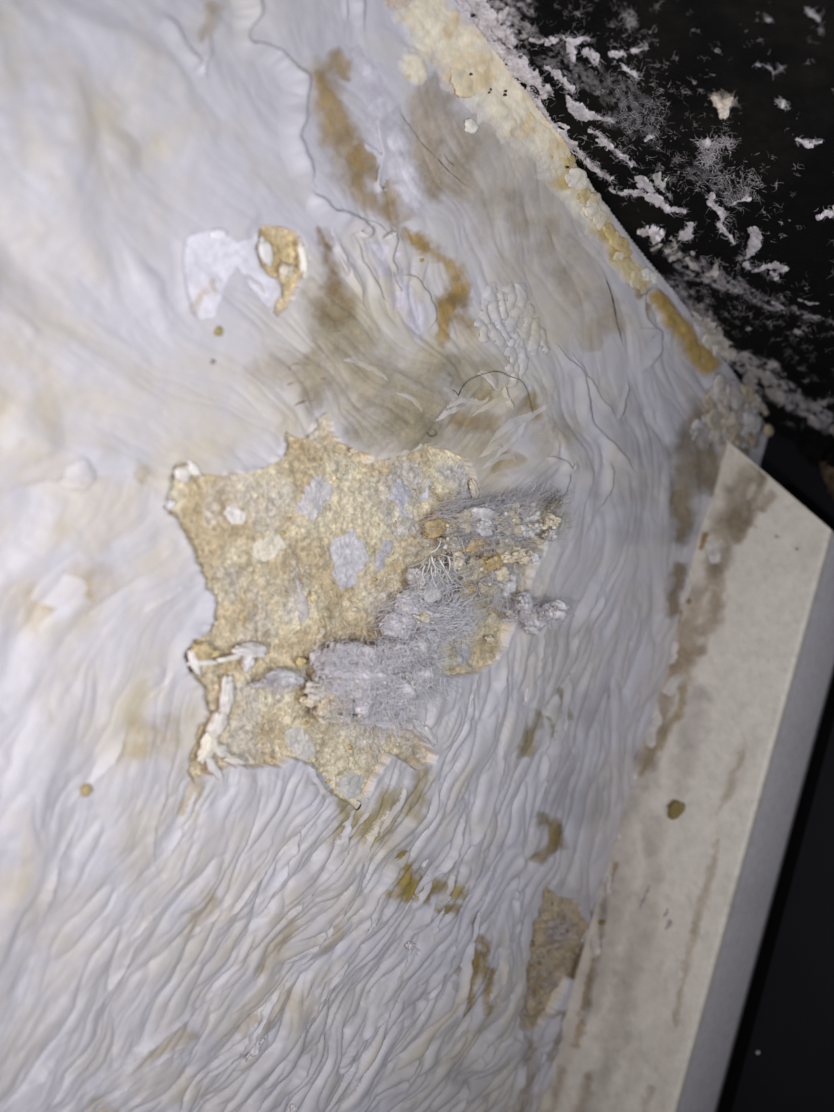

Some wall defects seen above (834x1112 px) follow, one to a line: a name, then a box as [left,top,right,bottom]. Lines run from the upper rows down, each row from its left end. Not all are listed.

peeling [171,226,308,336]
damp [316,70,350,133]
peeling [230,0,437,330]
damp [382,0,834,438]
spalling [149,416,538,806]
damp [251,469,584,745]
damp [520,730,534,755]
damp [671,413,719,542]
damp [631,473,766,787]
spalling [520,887,606,1030]